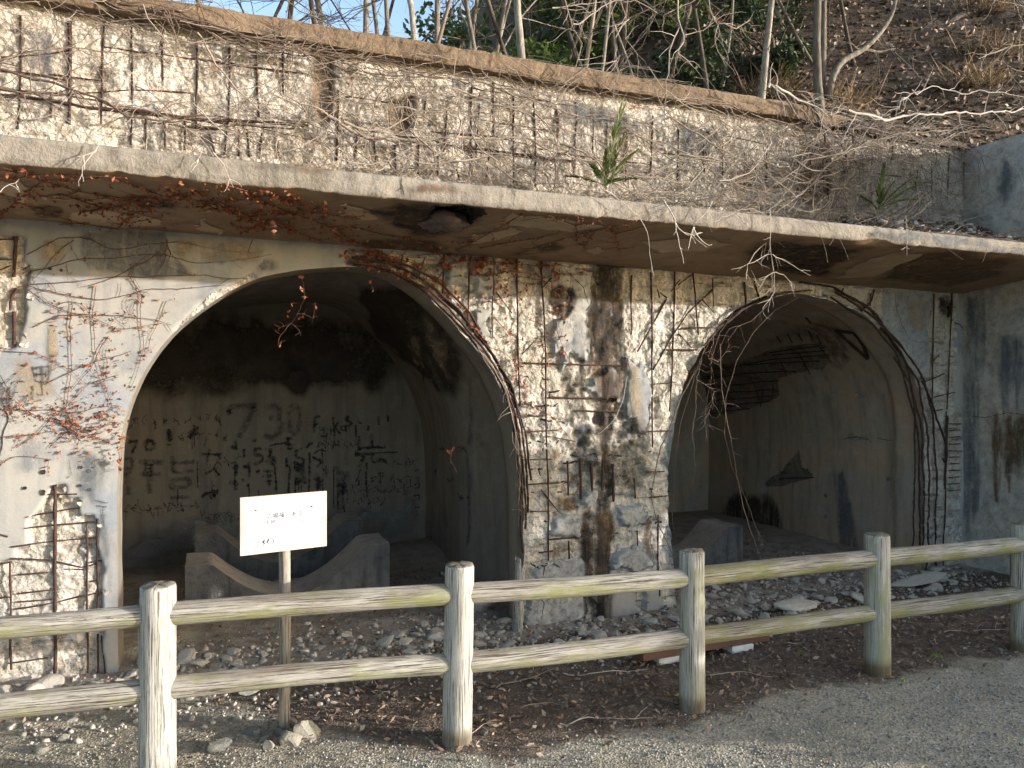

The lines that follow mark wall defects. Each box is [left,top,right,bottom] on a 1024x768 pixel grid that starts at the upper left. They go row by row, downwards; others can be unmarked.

peeling [0,181,62,207]
spalling [0,1,310,159]
spalling [336,61,950,215]
spalling [0,235,38,354]
leakage [559,265,642,576]
spalling [340,203,963,579]
leakage [993,338,1024,502]
spalling [0,484,109,616]
spalling [0,631,138,693]
leakage [584,594,612,619]
peeling [523,589,679,644]
spalling [921,560,992,592]